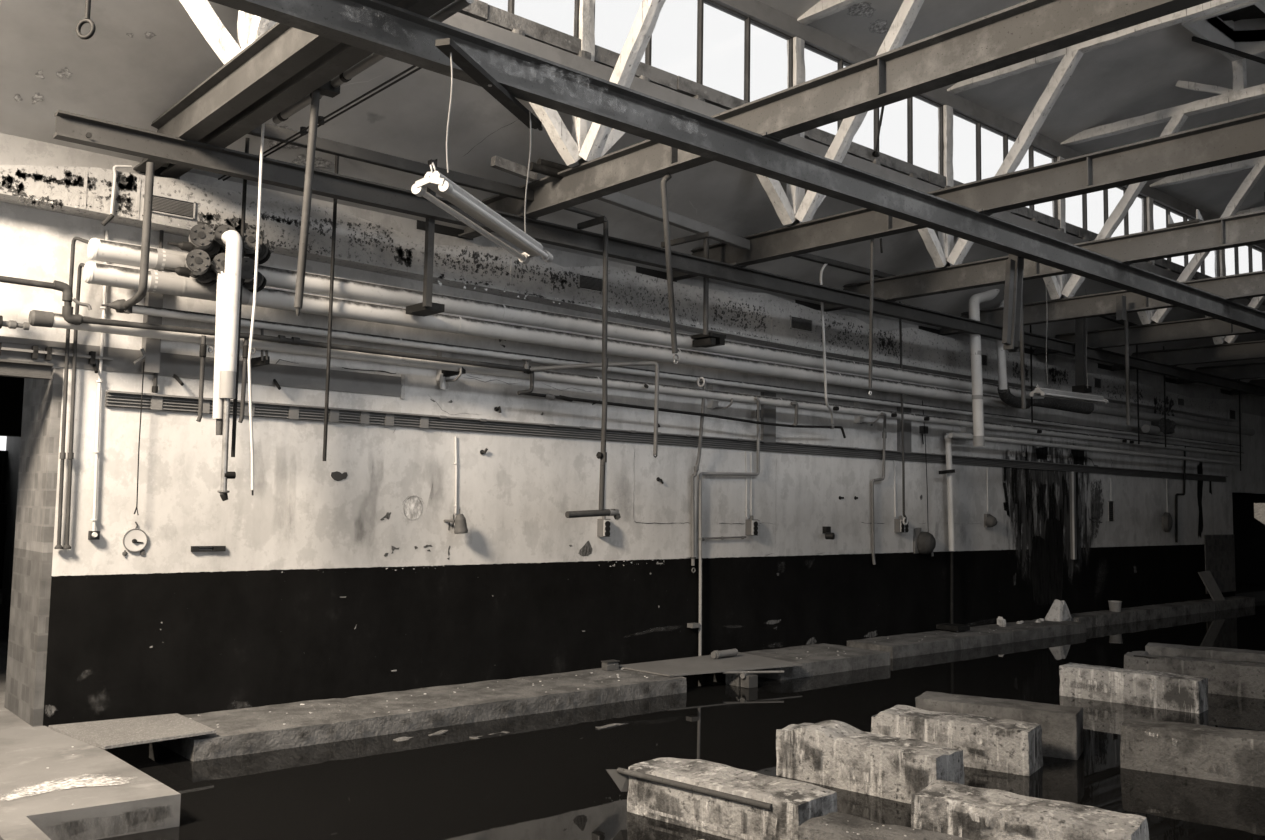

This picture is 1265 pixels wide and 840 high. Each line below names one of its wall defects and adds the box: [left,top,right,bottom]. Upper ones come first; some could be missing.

peeling [0,168,143,218]